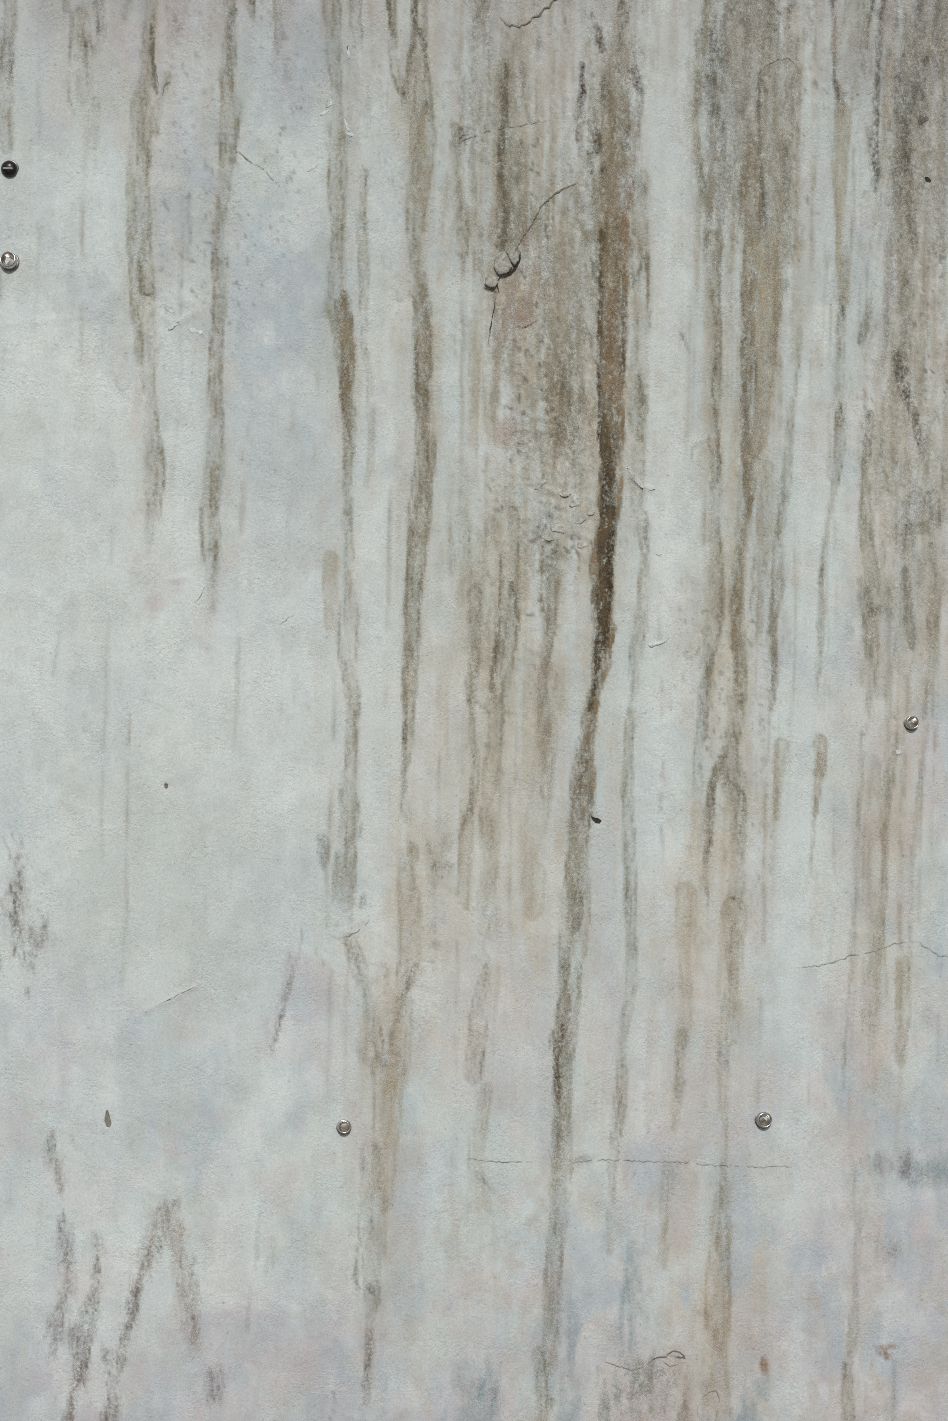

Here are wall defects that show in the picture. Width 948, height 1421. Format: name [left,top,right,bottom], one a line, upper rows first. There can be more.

leakage [137,16,156,168]
leakage [328,296,354,436]
leakage [392,0,433,148]
leakage [404,171,436,618]
spalling [484,250,521,344]
leakage [497,59,528,242]
crack [502,0,554,27]
crack [515,183,576,251]
leakage [740,147,778,391]
leakage [893,327,918,424]
leakage [477,544,519,689]